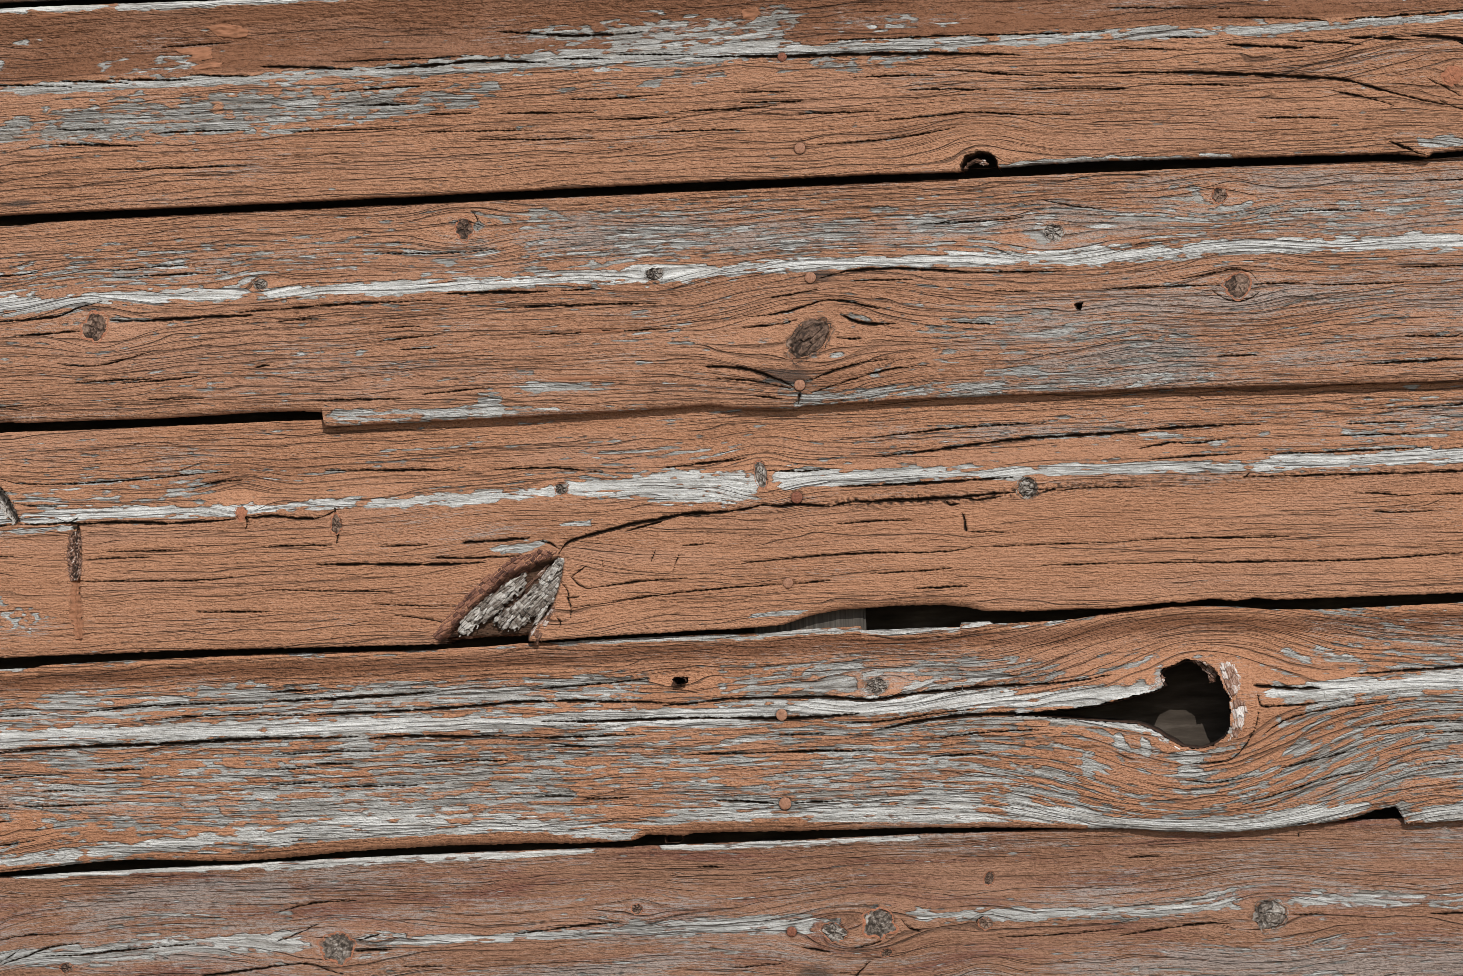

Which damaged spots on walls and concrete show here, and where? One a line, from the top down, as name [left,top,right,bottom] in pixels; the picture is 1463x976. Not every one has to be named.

peeling [0,0,1463,149]
crack [0,7,1463,144]
crack [58,129,251,170]
crack [1390,141,1461,181]
peeling [0,180,1463,317]
crack [1360,335,1463,365]
peeling [0,407,1463,581]
crack [0,403,1463,627]
peeling [0,590,60,640]
peeling [0,608,1463,976]